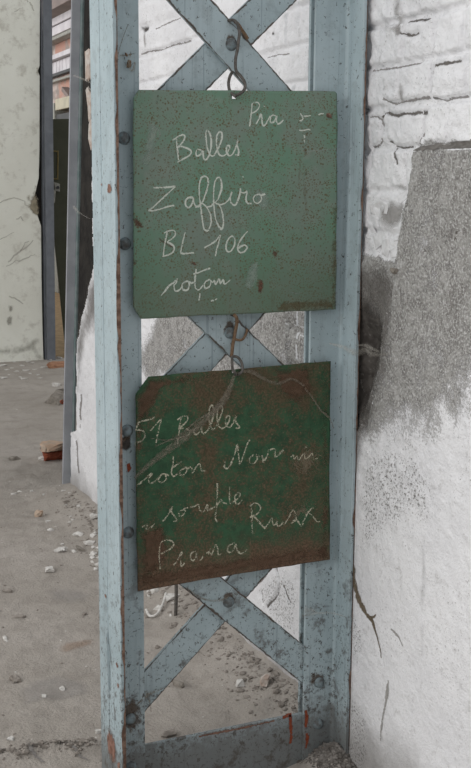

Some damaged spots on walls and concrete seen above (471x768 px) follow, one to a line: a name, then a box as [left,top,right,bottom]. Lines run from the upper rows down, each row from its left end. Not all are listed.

corrosion [101,38,324,768]
crack [353,568,403,656]
crack [380,682,389,741]